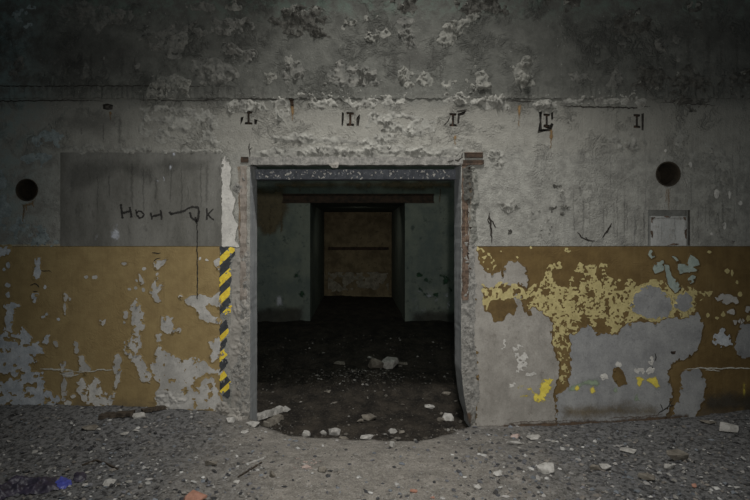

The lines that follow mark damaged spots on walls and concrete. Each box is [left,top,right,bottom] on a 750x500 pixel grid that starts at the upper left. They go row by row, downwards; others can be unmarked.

spalling [267,4,331,38]
spalling [390,0,418,15]
spalling [454,0,509,15]
crack [487,213,496,243]
crack [577,223,612,242]
peeling [0,155,251,421]
peeling [461,166,750,426]